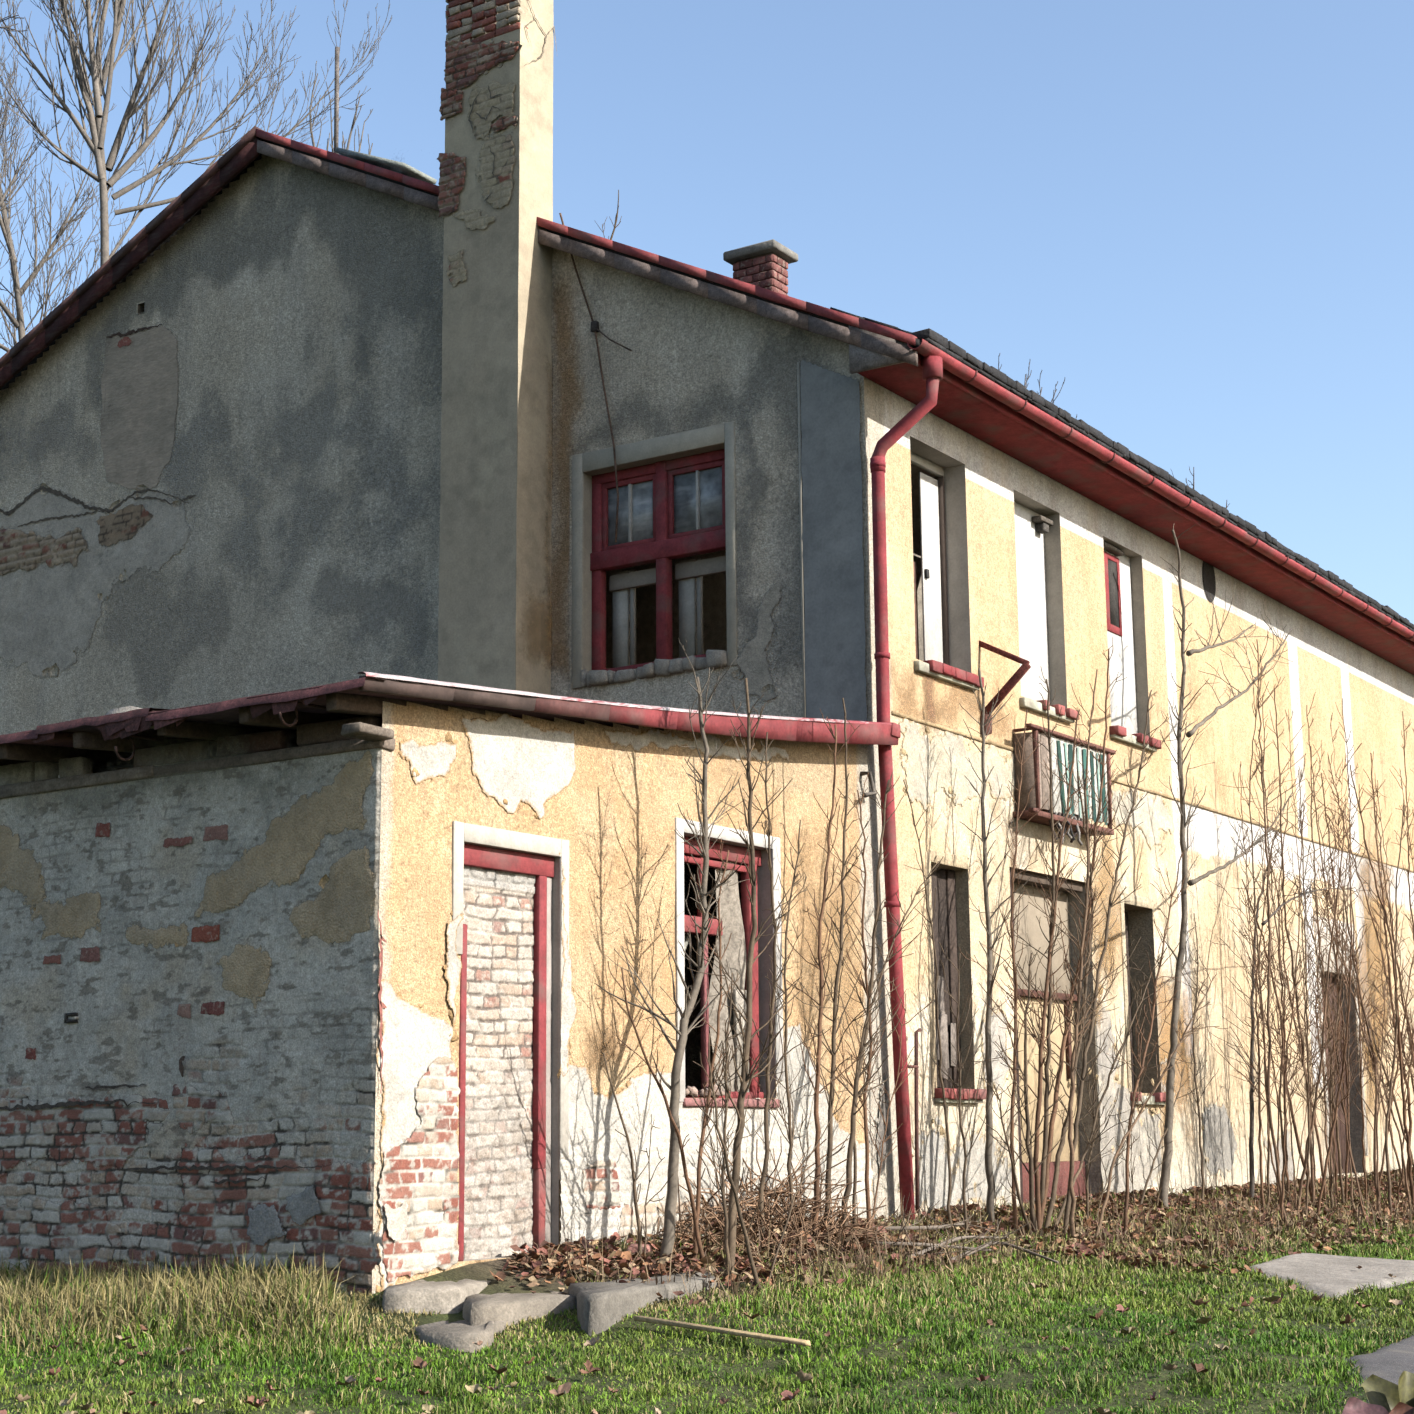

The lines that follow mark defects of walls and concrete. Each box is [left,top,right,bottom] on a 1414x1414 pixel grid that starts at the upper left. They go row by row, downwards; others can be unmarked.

flaking render [439,0,528,139]
spalling [437,152,467,218]
damp [91,166,443,401]
crack [0,486,195,527]
spalling [0,483,190,678]
damp [104,567,228,698]
peeling [126,751,377,1018]
peeling [399,713,576,819]
peeling [900,713,1015,812]
peeling [1112,785,1174,851]
spalling [0,910,464,1293]
peeling [557,853,890,1258]